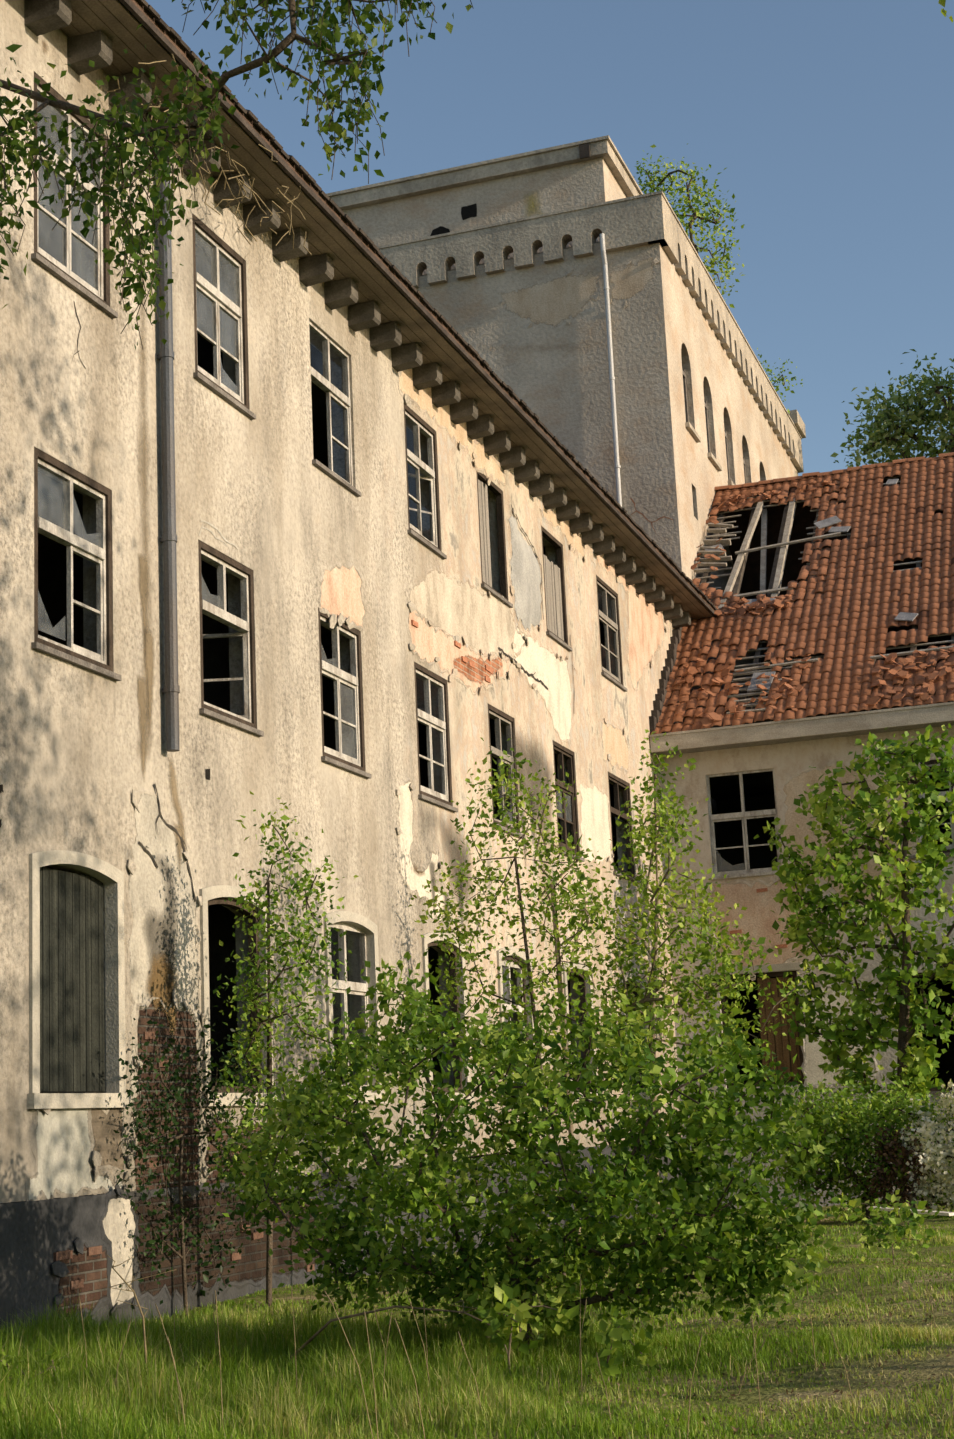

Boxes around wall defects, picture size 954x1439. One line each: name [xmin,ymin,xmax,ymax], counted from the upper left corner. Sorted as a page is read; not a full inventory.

flaking render [318,562,368,631]
flaking render [403,565,572,746]
crack [499,505,577,700]
crack [139,784,197,901]
flaking render [396,777,445,927]
flaking render [705,761,922,981]
flaking render [51,789,338,1321]